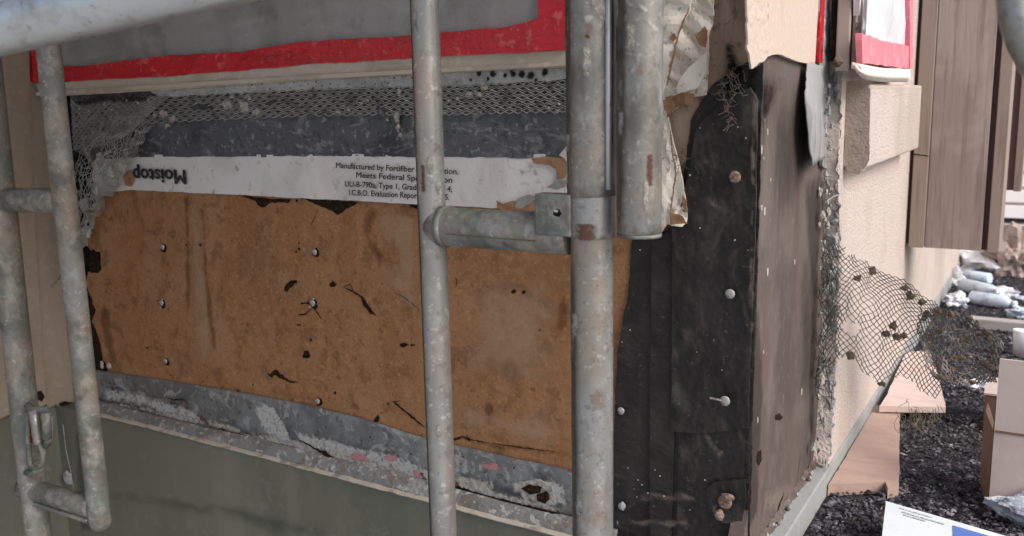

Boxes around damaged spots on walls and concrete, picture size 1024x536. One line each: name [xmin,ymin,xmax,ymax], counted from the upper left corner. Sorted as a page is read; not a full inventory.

peeling [126,98,176,129]
peeling [222,94,260,116]
peeling [447,82,487,102]
spalling [811,68,843,468]
crack [344,284,413,316]
crack [393,400,425,428]
leakage [105,390,428,480]
spalling [312,446,345,460]
crack [454,435,553,452]
spalling [519,479,557,506]